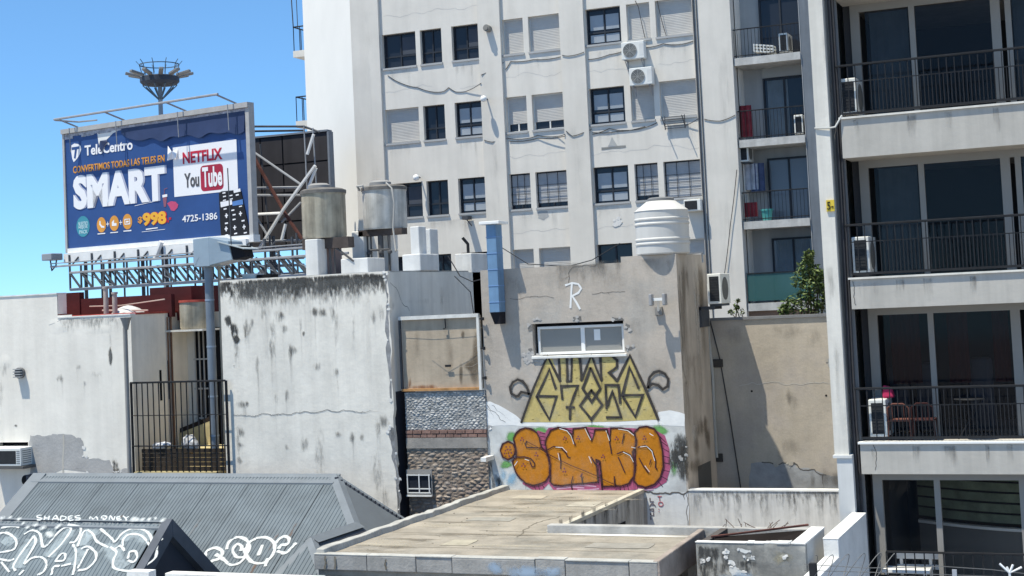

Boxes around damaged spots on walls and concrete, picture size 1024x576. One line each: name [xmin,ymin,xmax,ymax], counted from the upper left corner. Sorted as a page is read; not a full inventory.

water stain [219,273,385,297]
water stain [225,316,253,344]
crack [235,409,375,417]
peeling [29,434,115,474]
spalling [749,461,838,489]